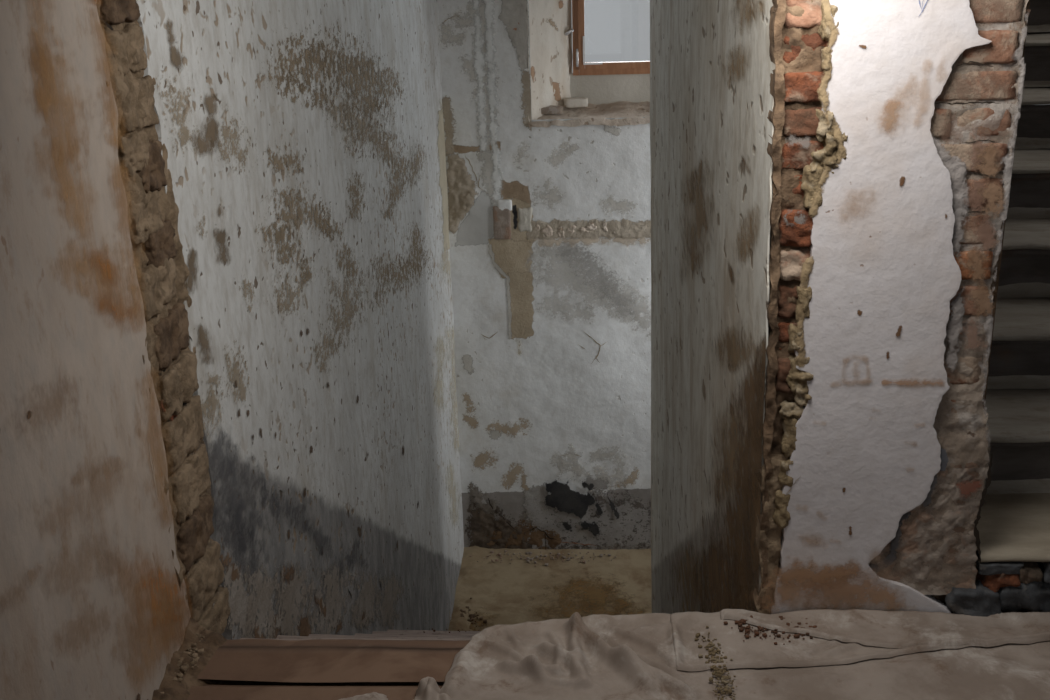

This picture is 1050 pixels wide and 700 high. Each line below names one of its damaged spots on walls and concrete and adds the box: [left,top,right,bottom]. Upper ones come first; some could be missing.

spalling [96,0,231,634]
peeling [256,23,435,388]
spalling [442,95,501,234]
peeling [499,0,535,131]
peeling [552,82,561,101]
spalling [488,142,651,339]
spalling [753,0,848,614]
flaking render [869,0,1029,595]
water stain [545,480,620,537]